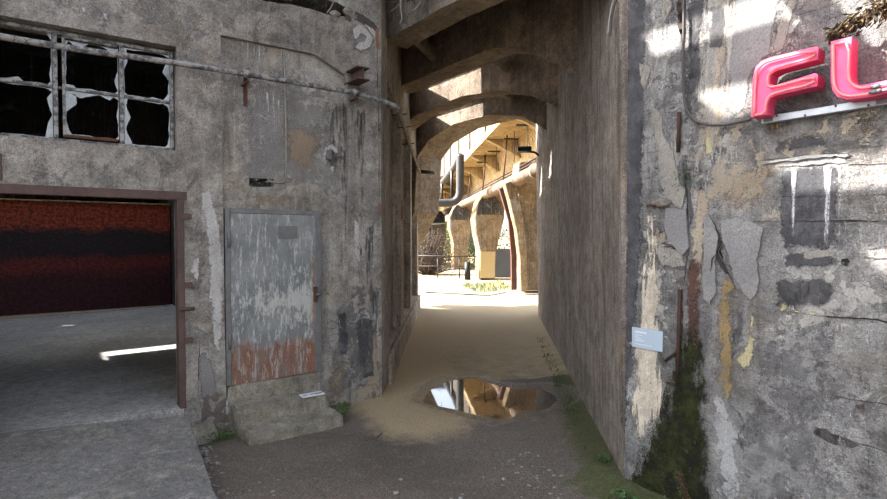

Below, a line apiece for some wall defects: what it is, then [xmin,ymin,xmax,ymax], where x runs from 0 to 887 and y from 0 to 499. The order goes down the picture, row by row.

spalling [263,0,379,51]
flaking render [639,63,651,90]
flaking render [650,106,710,386]
water stain [621,0,887,499]
spalling [718,278,735,400]
crack [774,310,887,323]
crack [825,393,887,405]